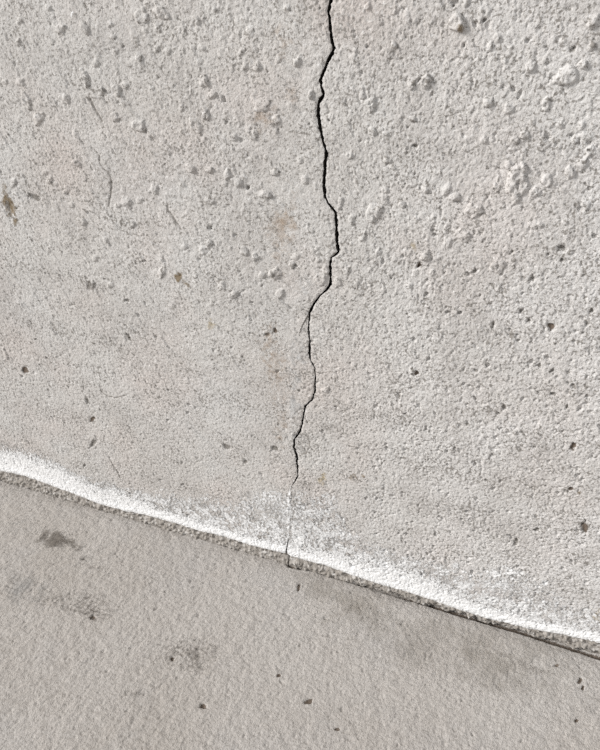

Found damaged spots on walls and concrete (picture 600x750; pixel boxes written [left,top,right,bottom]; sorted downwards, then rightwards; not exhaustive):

crack [291,0,340,488]